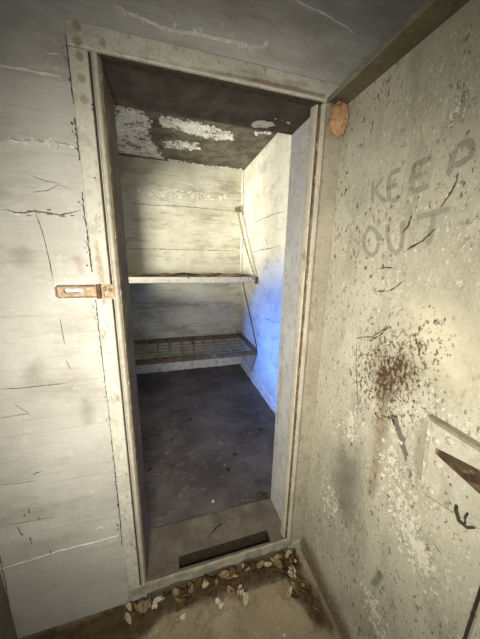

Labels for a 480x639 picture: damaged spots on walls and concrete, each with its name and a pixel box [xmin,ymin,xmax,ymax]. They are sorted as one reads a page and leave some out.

peeling [115,105,242,170]
peeling [251,118,290,136]
crack [440,173,459,208]
crack [7,176,93,280]
crack [406,228,436,251]